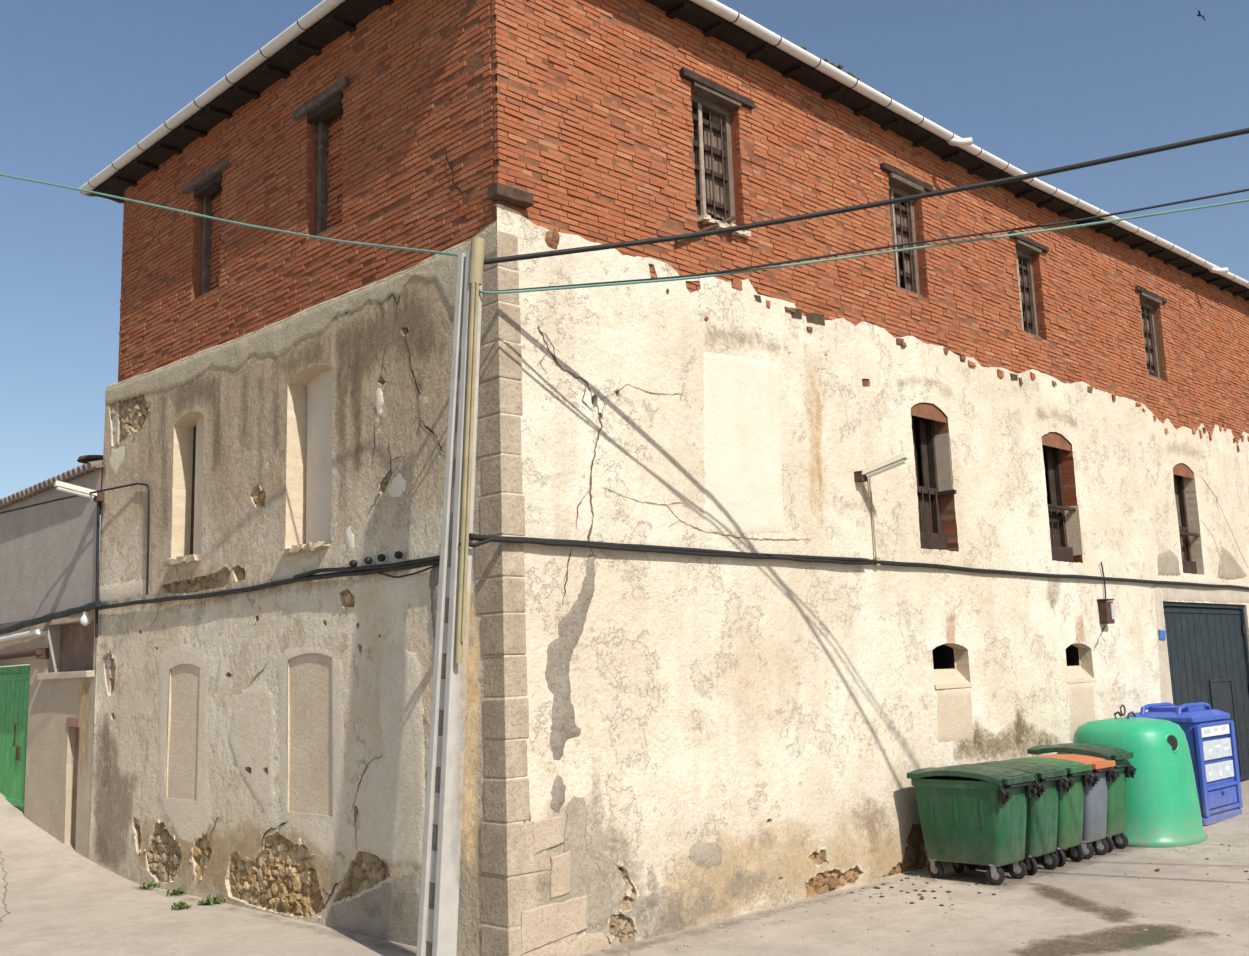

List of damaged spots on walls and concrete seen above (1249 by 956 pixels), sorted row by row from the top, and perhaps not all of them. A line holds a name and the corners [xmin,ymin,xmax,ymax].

flaking render [545,228,560,249]
spalling [791,308,825,325]
flaking render [110,392,150,445]
crack [335,294,445,512]
water stain [338,290,443,488]
crack [538,326,811,599]
flaking render [159,564,246,595]
crack [352,755,382,838]
flaking render [133,819,212,883]
flaking render [224,832,390,918]
flaking render [607,861,638,946]
flaking render [805,847,860,897]